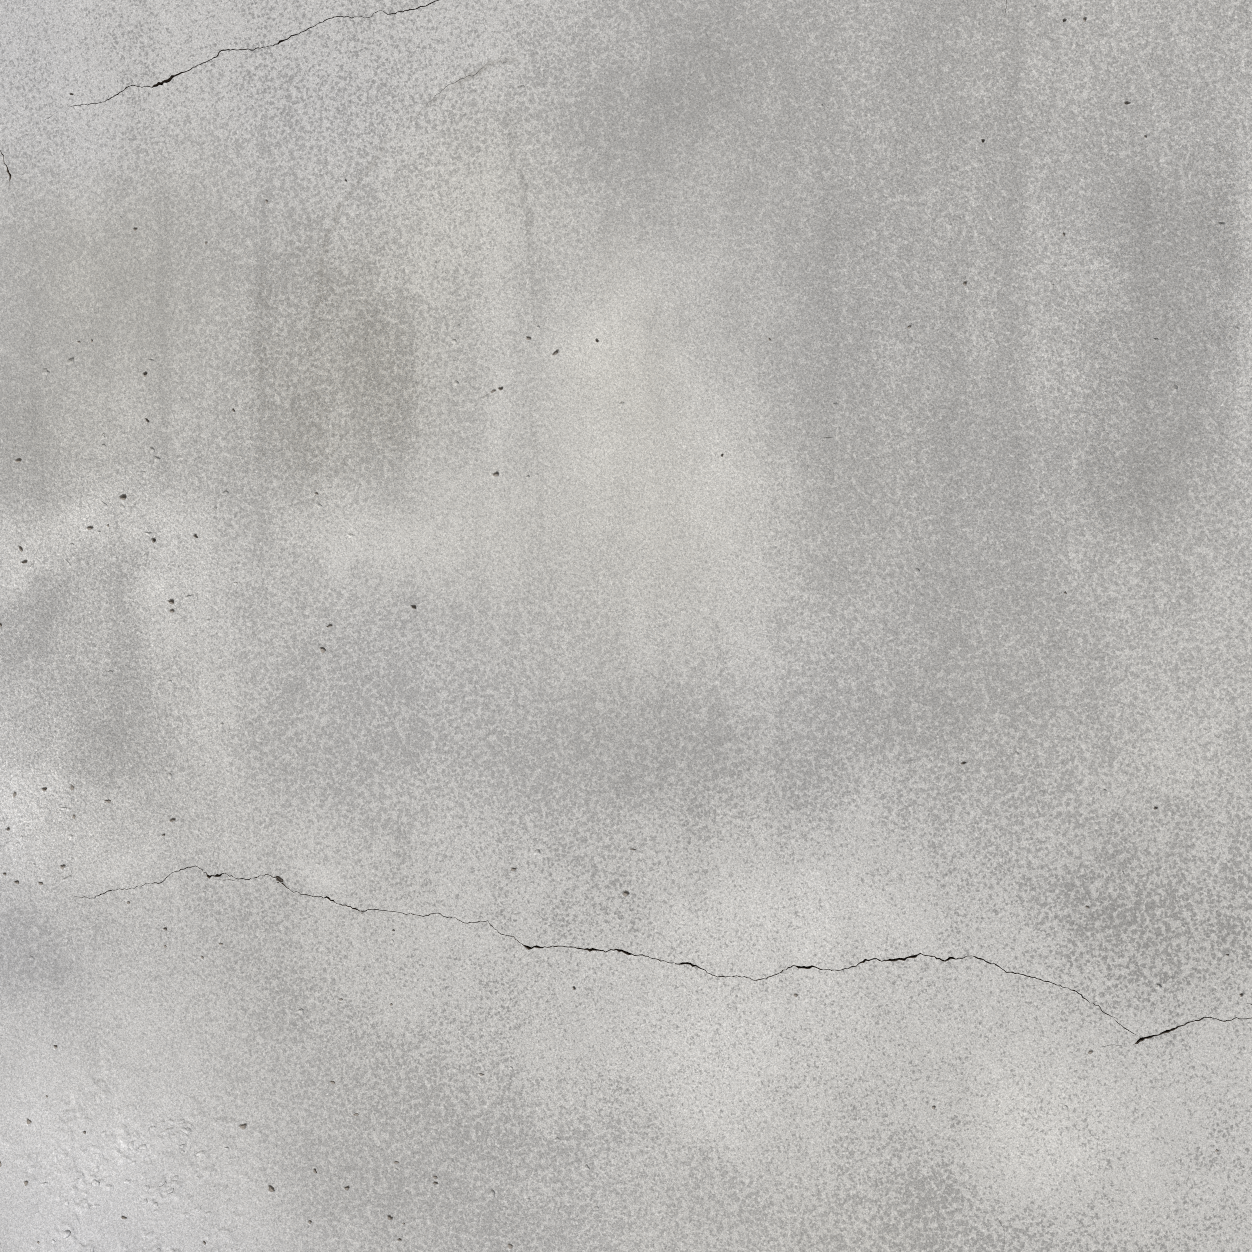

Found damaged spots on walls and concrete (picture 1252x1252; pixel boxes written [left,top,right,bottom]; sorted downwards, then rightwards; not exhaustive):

crack [41,0,439,123]
crack [0,150,11,185]
crack [44,866,1252,1047]